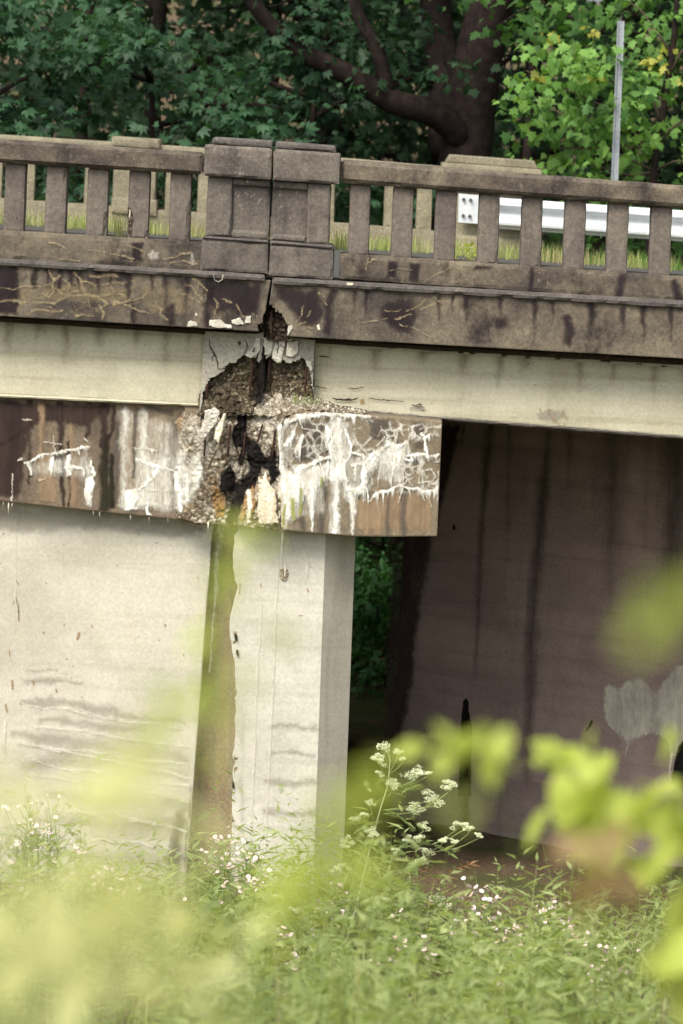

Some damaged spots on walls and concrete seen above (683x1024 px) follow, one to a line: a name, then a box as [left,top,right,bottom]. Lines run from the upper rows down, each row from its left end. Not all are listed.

crack [9,242,168,320]
crack [171,252,239,318]
leakage [277,287,337,334]
leakage [382,300,415,332]
leakage [409,263,420,281]
leakage [564,315,574,344]
leakage [615,274,625,320]
leakage [669,280,683,322]
spalling [175,299,315,532]
leakage [0,400,202,526]
corrosion [240,485,259,520]
leakage [207,412,465,781]